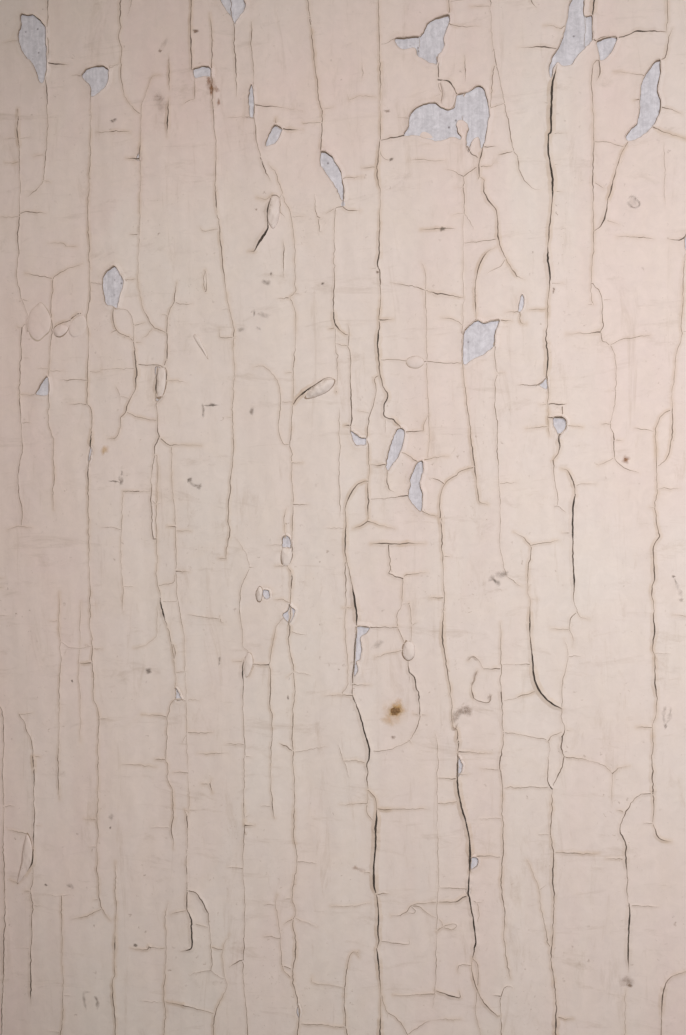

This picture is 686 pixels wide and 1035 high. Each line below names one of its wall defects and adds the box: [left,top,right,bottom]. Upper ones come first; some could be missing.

peeling [14,10,51,87]
peeling [78,62,113,101]
peeling [391,11,454,69]
peeling [400,82,494,157]
peeling [544,0,622,82]
peeling [621,56,666,146]
peeling [316,147,349,204]
peeling [99,262,128,312]
peeling [458,315,504,369]
peeling [382,424,428,516]
crack [0,0,468,1035]
crack [390,0,686,1035]